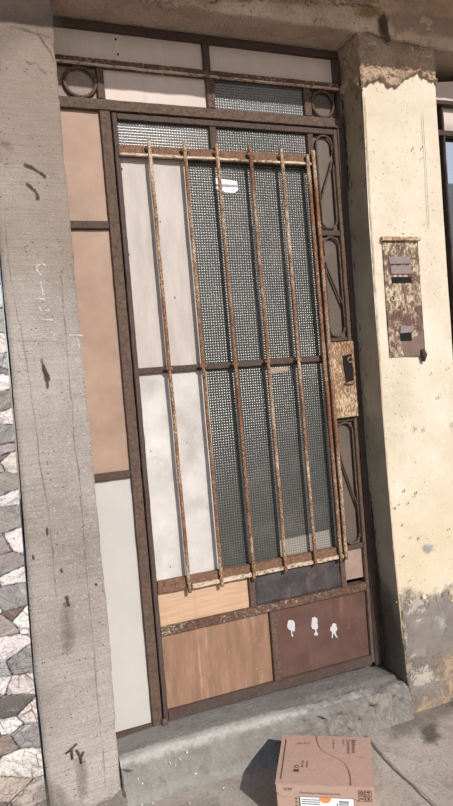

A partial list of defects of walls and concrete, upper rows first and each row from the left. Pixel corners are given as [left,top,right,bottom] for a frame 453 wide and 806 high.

spalling [238,0,438,191]
peeling [370,496,385,665]
peeling [396,580,453,714]
damp [422,724,439,742]